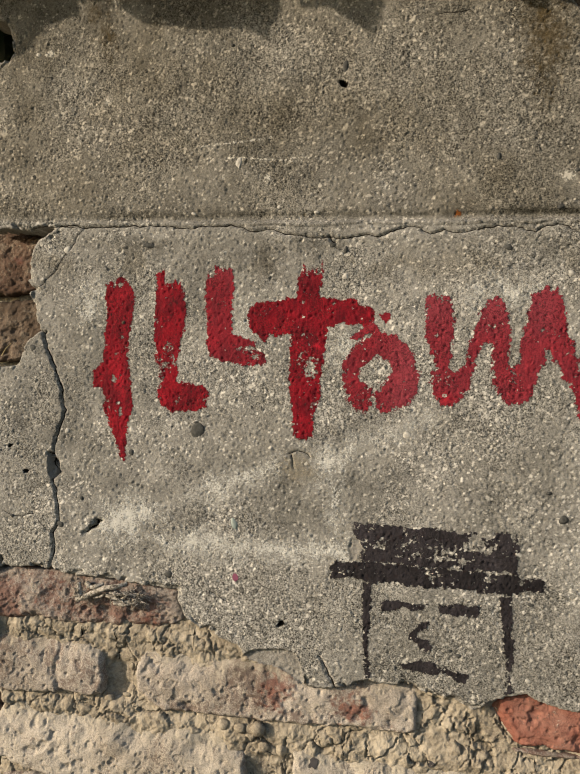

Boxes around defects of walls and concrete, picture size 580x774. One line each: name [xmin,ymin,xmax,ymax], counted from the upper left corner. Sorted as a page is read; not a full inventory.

crack [35,223,579,288]
peeling [242,648,304,713]
peeling [331,693,370,725]